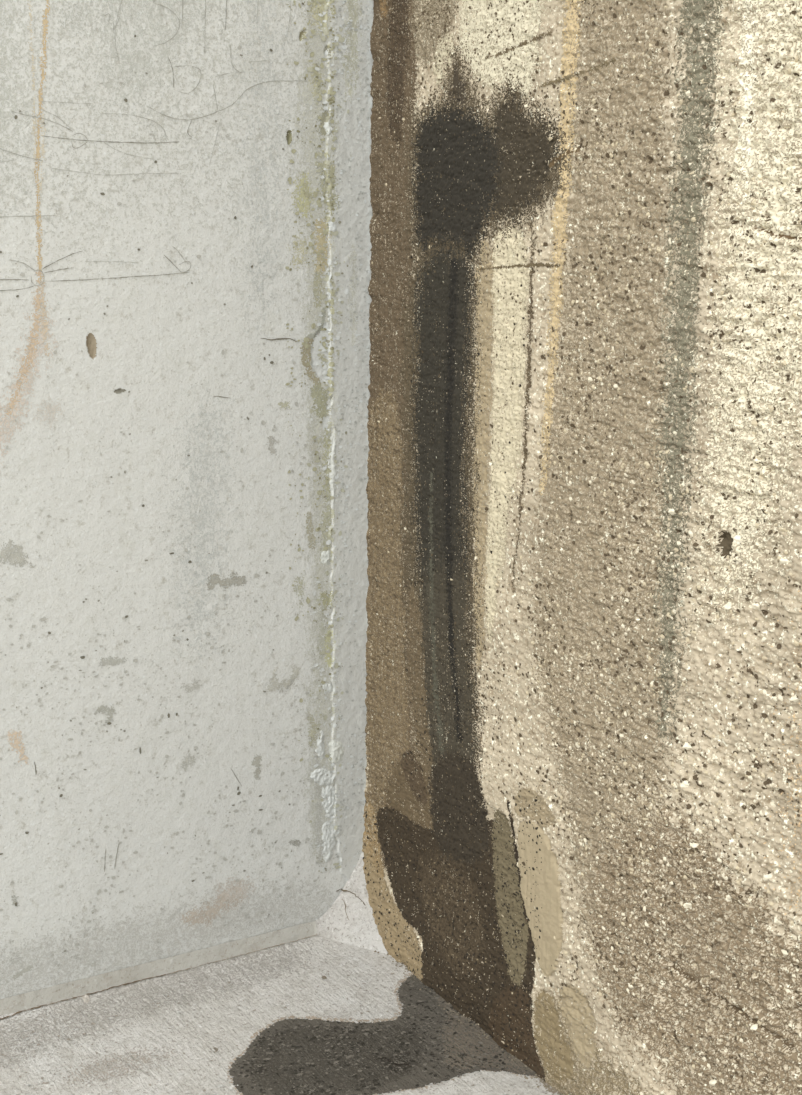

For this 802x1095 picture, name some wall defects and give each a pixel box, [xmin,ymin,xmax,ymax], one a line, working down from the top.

corrosion [0,0,65,466]
crack [754,225,802,241]
crack [480,262,560,272]